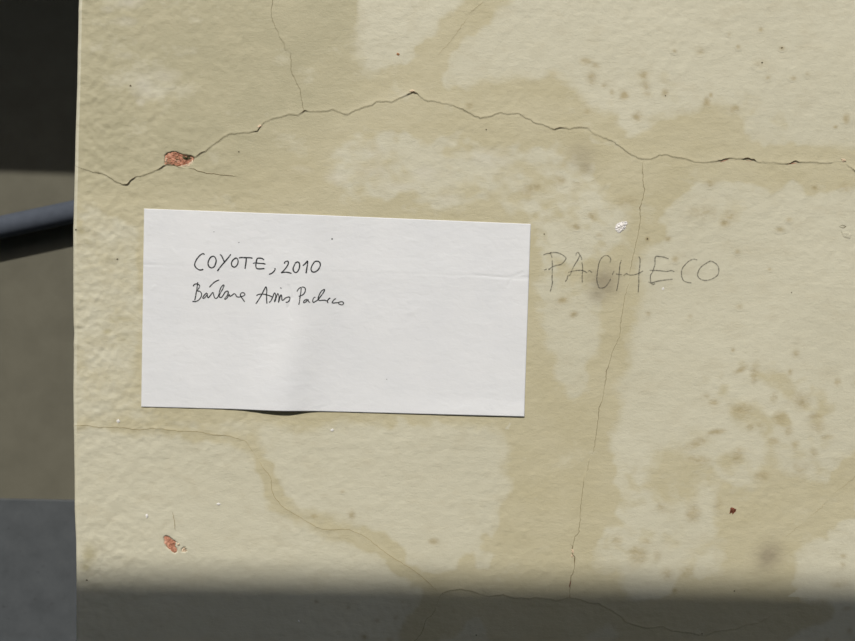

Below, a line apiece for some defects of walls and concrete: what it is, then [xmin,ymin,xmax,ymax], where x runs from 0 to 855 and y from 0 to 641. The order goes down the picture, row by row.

spalling [165,152,194,167]
crack [81,0,418,185]
water stain [77,0,855,267]
crack [589,151,855,460]
water stain [76,178,855,641]
spalling [164,536,187,553]
crack [563,482,641,627]